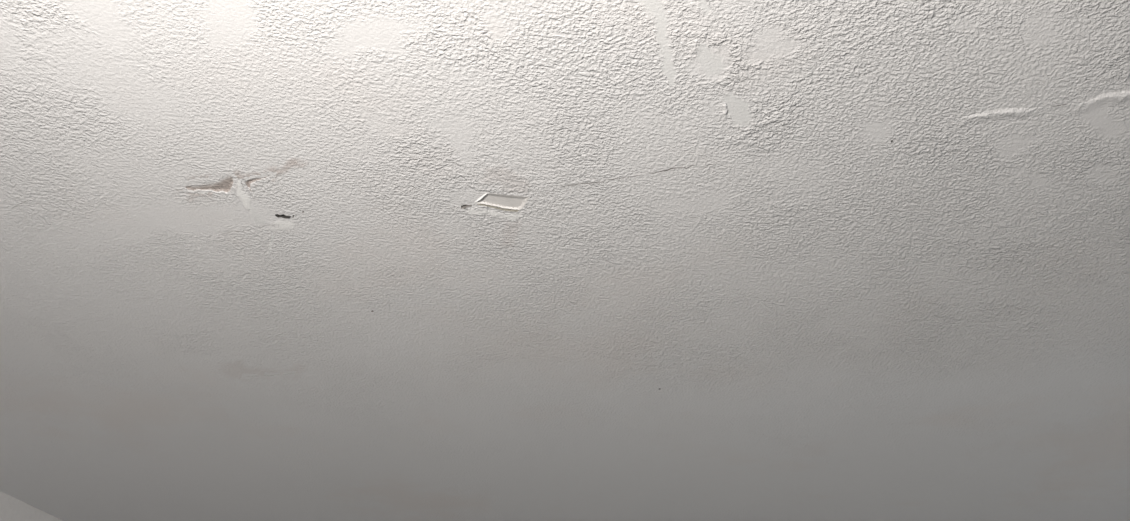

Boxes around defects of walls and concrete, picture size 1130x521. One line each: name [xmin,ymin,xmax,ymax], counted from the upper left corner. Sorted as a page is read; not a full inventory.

flaking render [174,156,315,204]
flaking render [461,193,529,222]